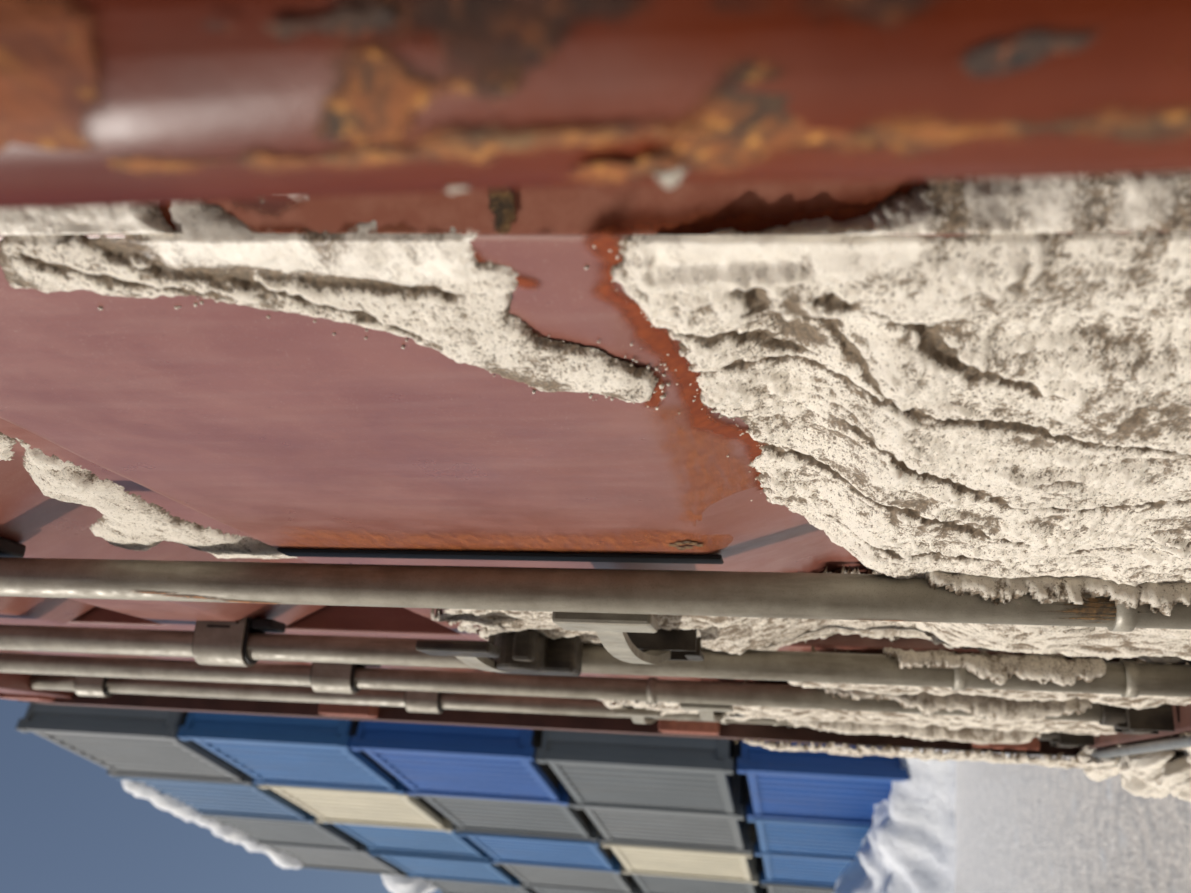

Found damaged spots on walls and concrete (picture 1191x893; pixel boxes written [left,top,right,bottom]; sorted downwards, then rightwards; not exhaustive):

rust [0,0,98,152]
rust [111,158,217,173]
rust [238,0,636,170]
rust [206,62,1191,234]